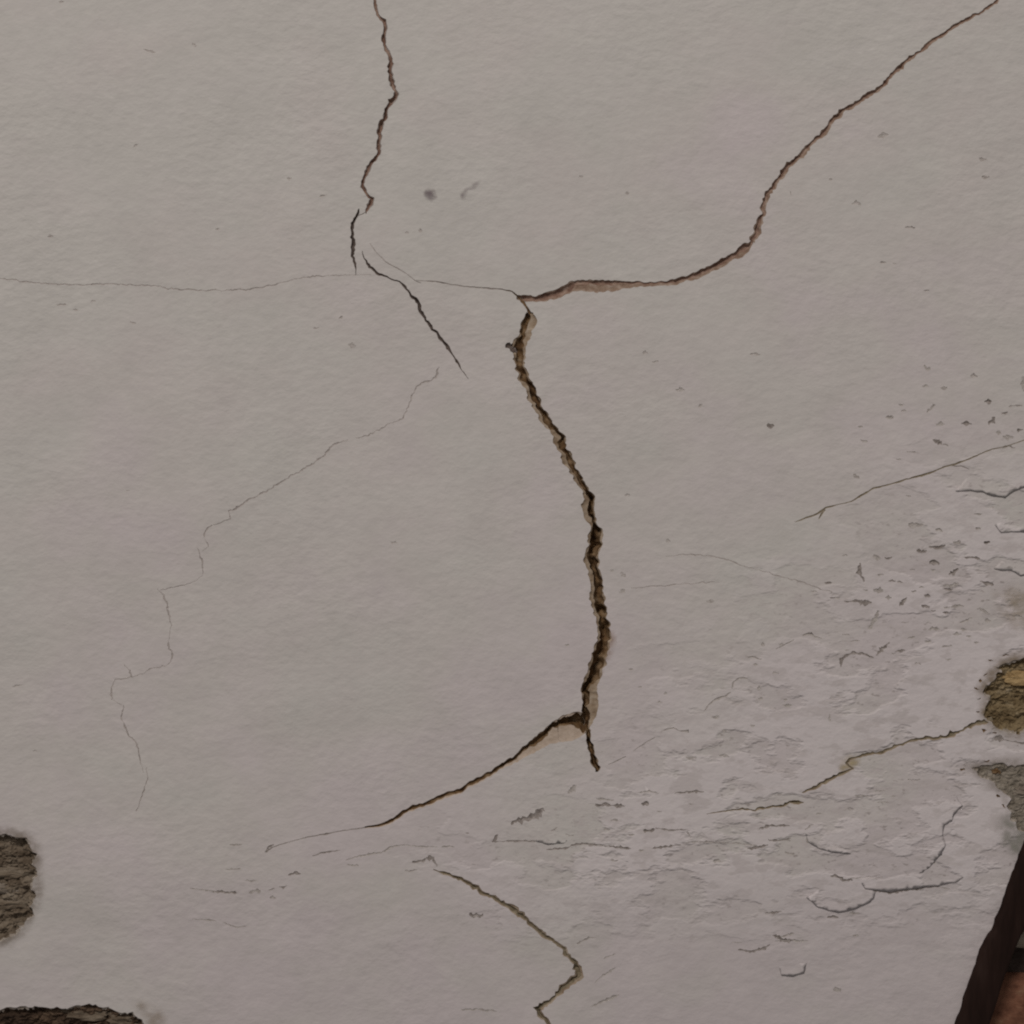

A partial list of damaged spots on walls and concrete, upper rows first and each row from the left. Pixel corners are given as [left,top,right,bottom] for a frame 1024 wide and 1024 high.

crack [0,0,468,378]
crack [266,0,1024,852]
crack [110,367,439,811]
flaking render [974,654,1024,744]
flaking render [960,760,1024,832]
flaking render [0,834,38,942]
flaking render [0,1004,144,1024]
crack [433,869,584,1024]